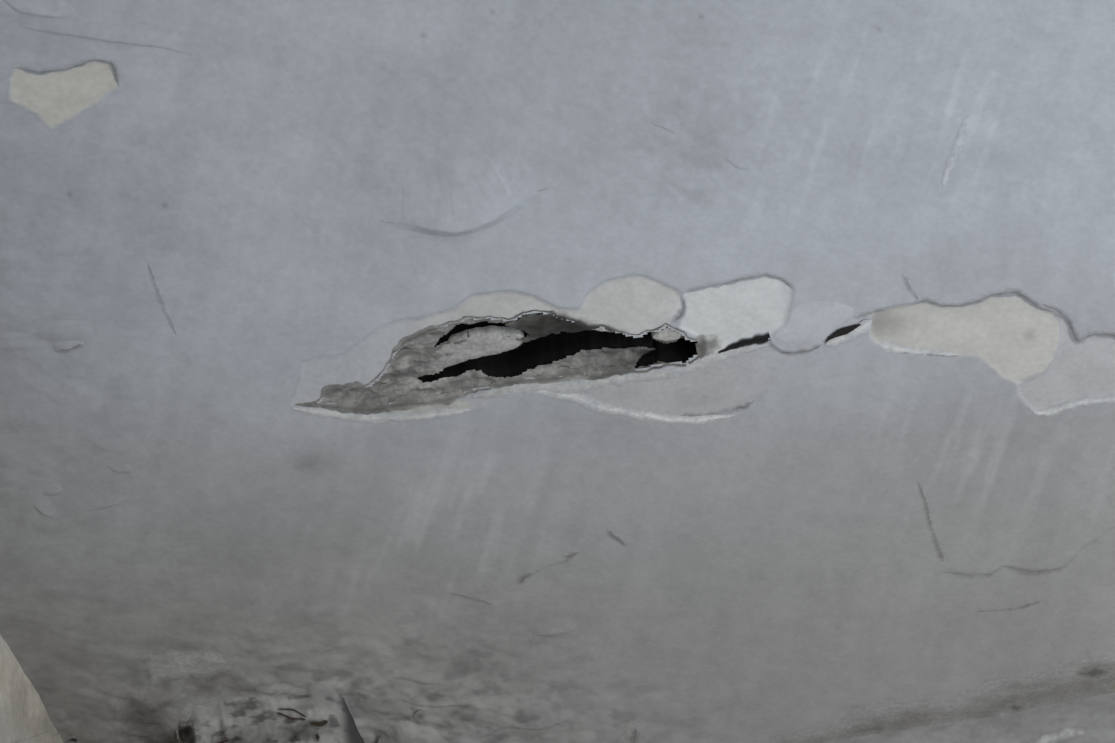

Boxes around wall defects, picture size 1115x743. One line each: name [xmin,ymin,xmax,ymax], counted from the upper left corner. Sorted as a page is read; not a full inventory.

peeling [6,57,121,130]
spalling [290,272,854,425]
spalling [868,286,1115,417]
leakage [112,682,309,743]